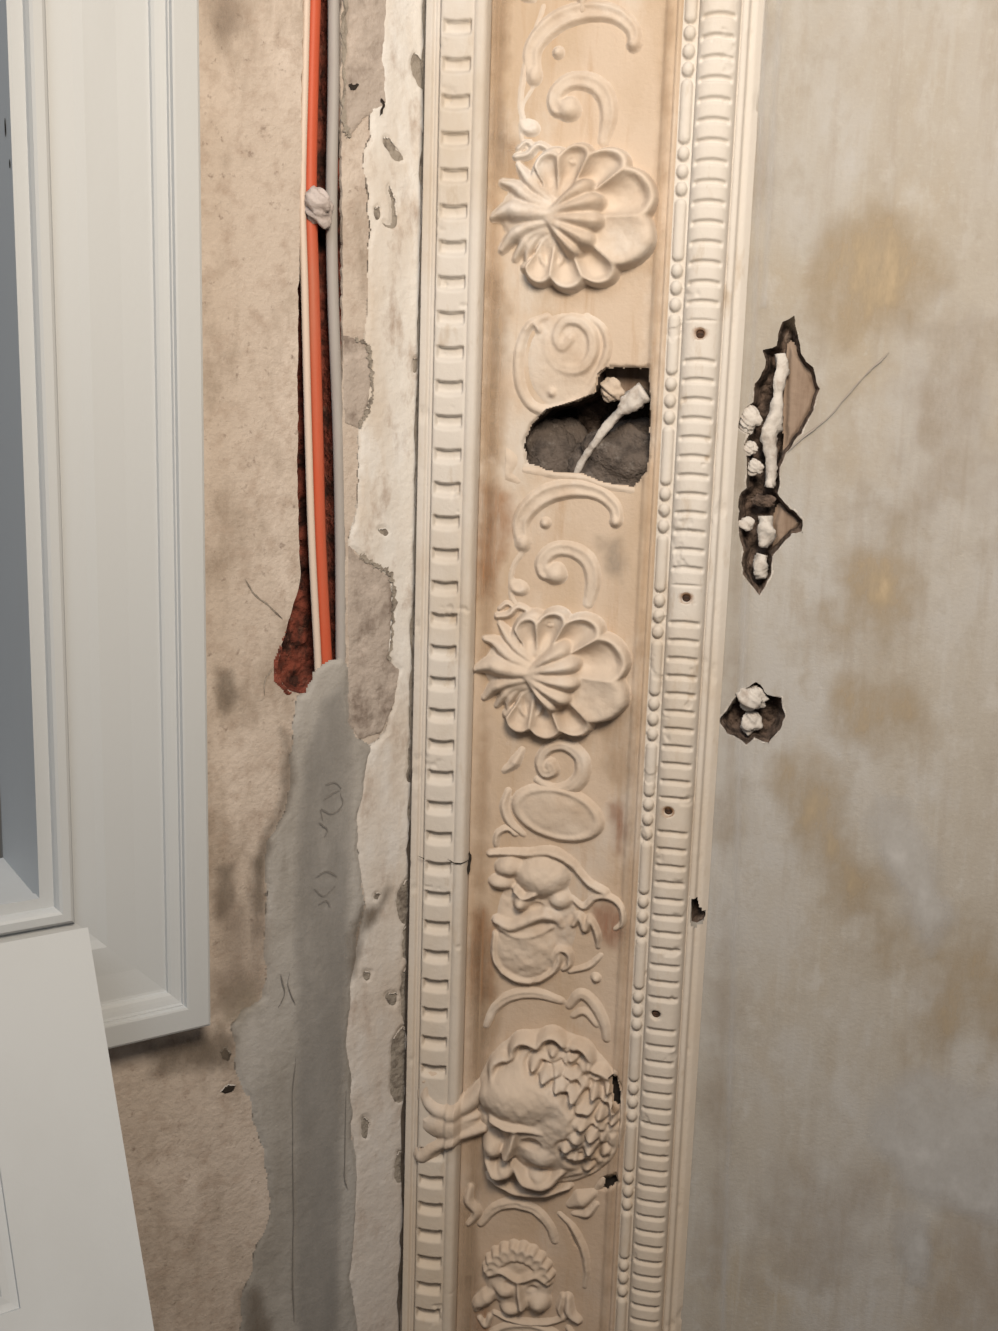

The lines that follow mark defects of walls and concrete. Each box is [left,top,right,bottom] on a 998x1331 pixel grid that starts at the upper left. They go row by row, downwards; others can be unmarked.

spalling [274,256,315,695]
spalling [505,367,651,494]
spalling [737,314,820,597]
peeling [317,0,424,1331]
spalling [719,681,786,746]